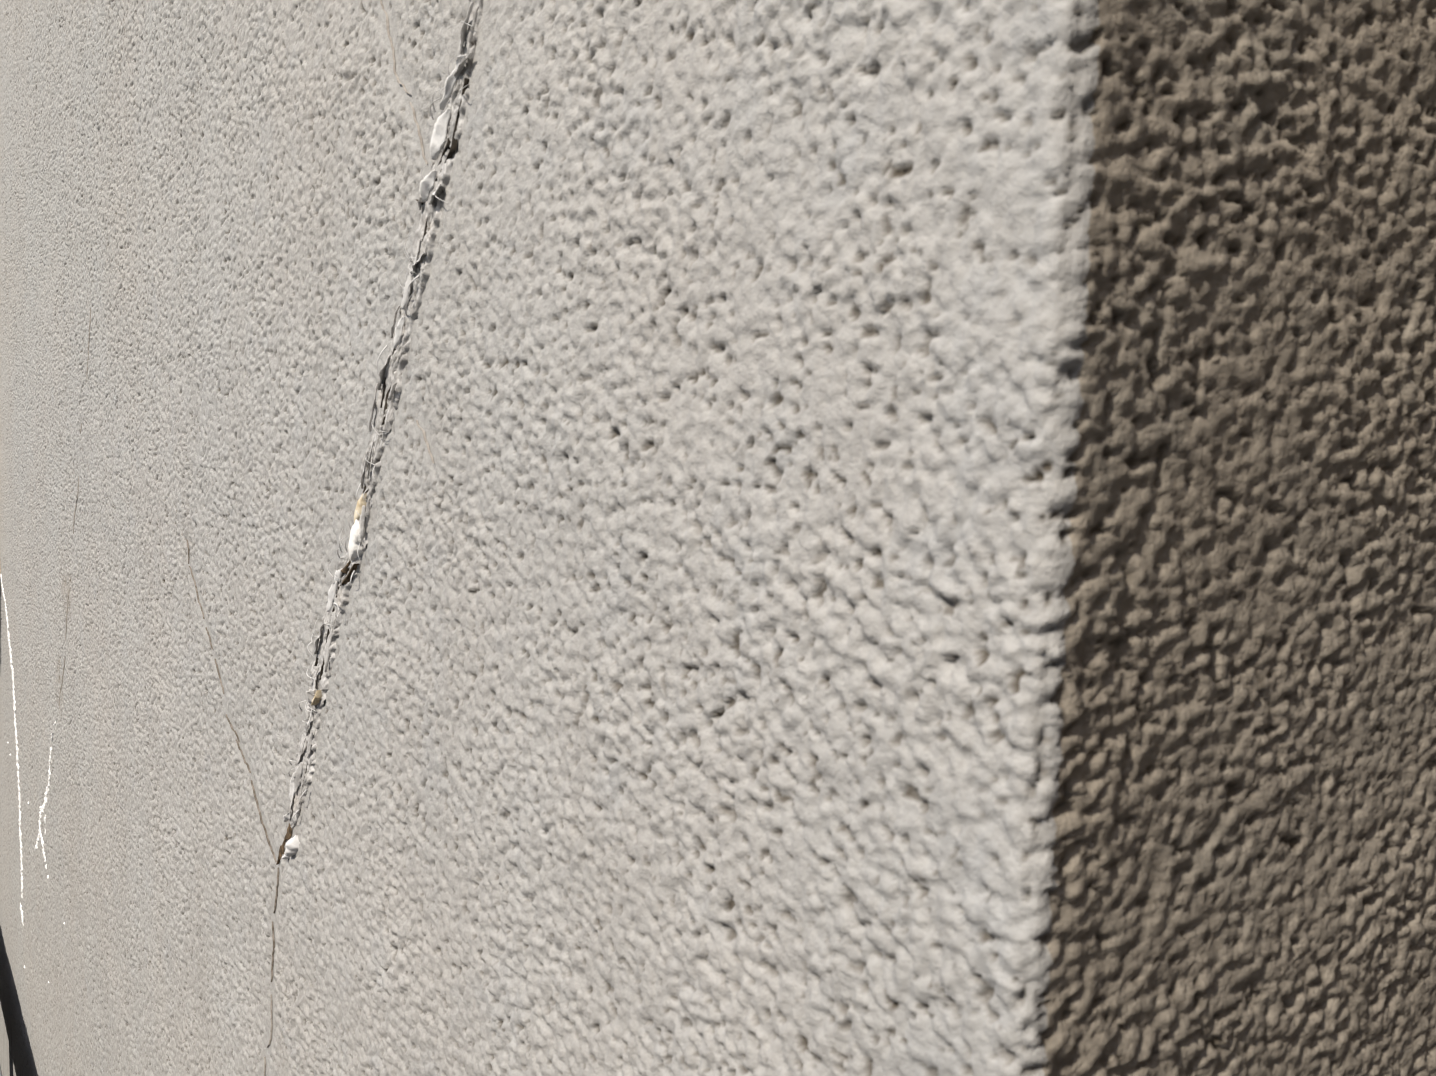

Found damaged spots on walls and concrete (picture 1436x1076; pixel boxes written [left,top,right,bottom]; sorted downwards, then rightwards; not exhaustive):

crack [72,476,80,534]
crack [84,308,92,379]
crack [187,0,483,1076]
crack [0,574,70,926]